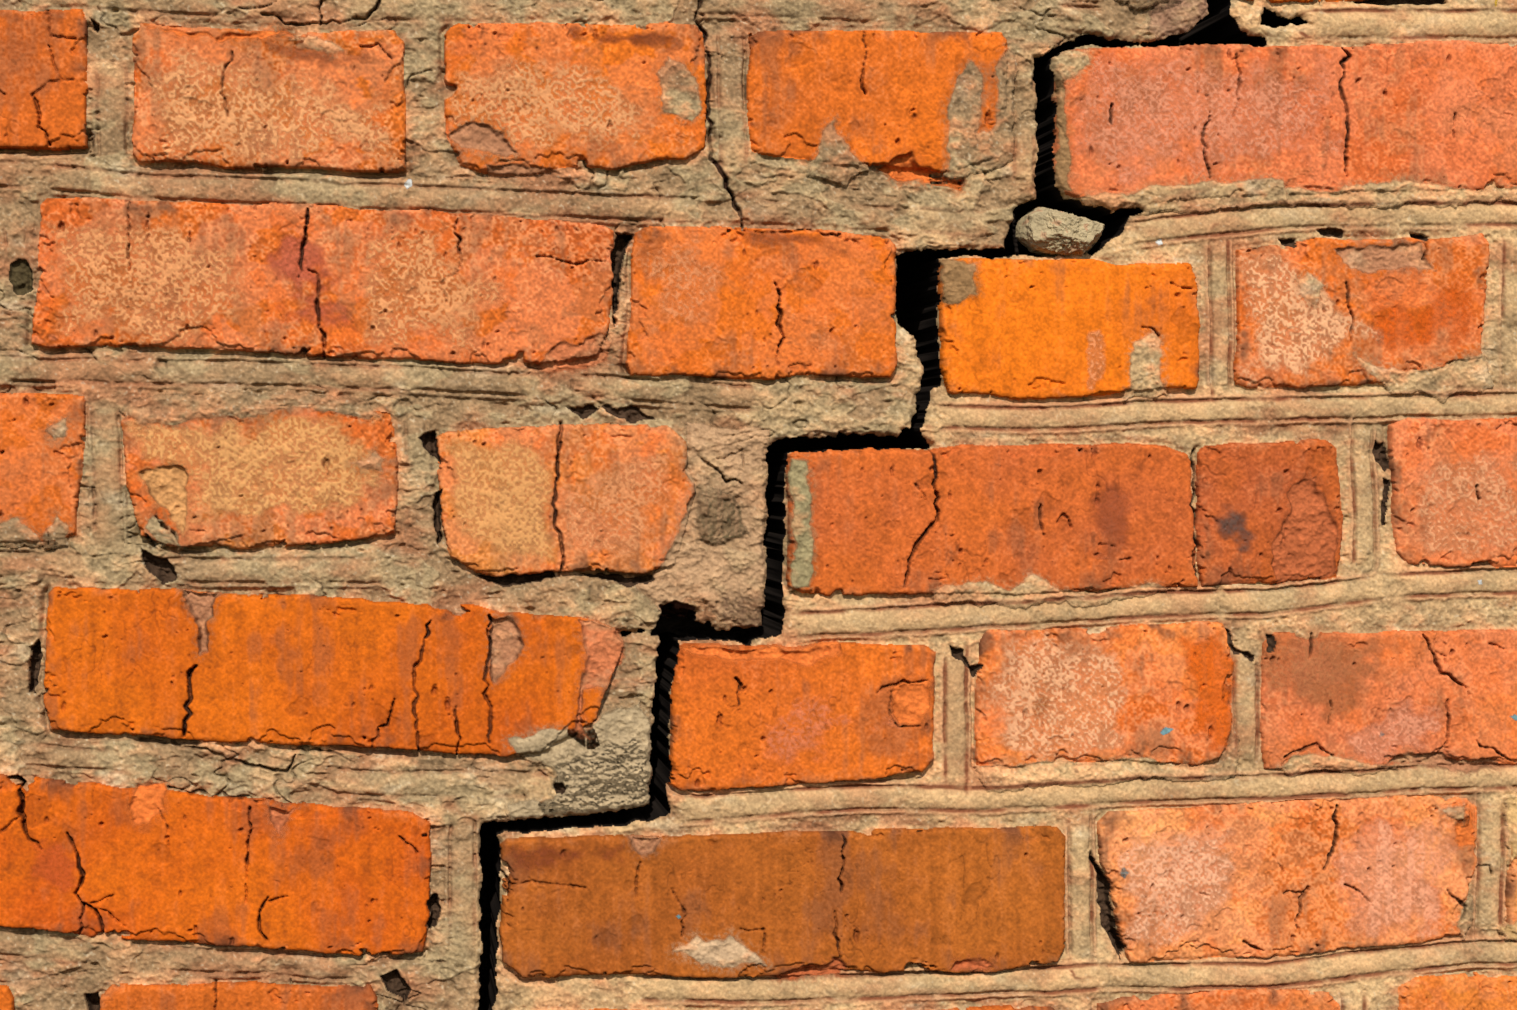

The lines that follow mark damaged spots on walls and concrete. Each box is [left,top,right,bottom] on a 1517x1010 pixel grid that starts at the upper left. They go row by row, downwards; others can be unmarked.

crack [1338,52,1350,160]
spalling [878,152,964,191]
crack [299,209,320,321]
spalling [139,465,188,533]
peeling [352,451,384,472]
crack [478,0,1308,1010]
crack [381,622,430,749]
crack [455,615,492,743]
spalling [489,616,524,683]
spalling [576,620,624,739]
crack [13,775,28,833]
crack [77,853,104,931]